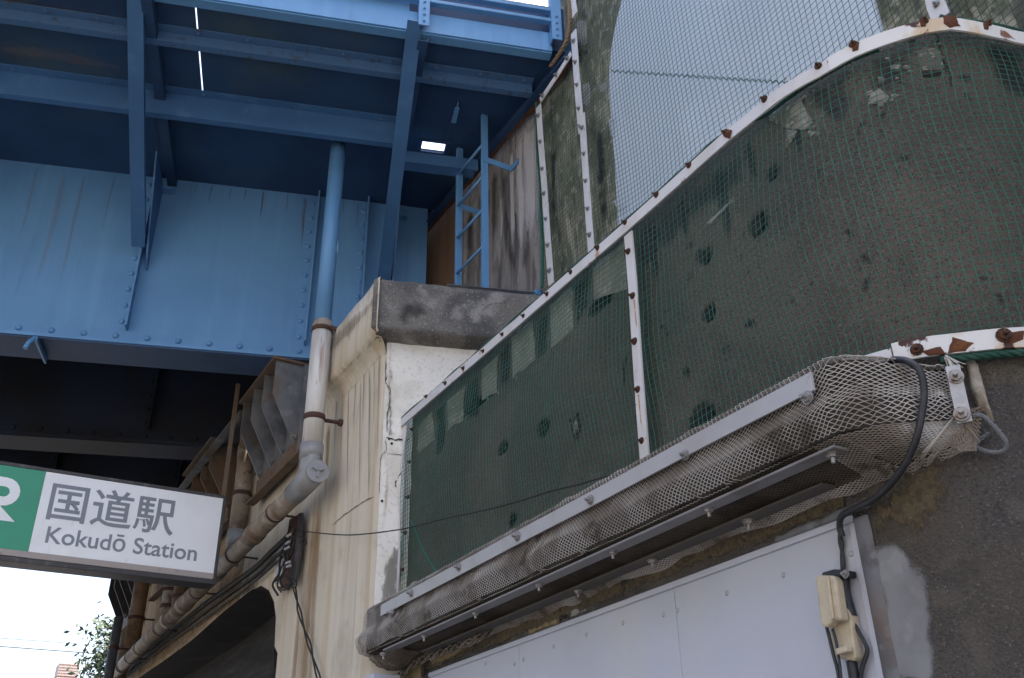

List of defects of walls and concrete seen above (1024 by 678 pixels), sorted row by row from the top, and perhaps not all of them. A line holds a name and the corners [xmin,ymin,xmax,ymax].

rust [943,16,960,28]
spalling [867,37,945,107]
spalling [764,90,823,148]
water stain [488,126,555,263]
water stain [597,134,606,213]
rust [923,337,973,356]
rust [1010,331,1024,344]
crack [333,362,409,525]